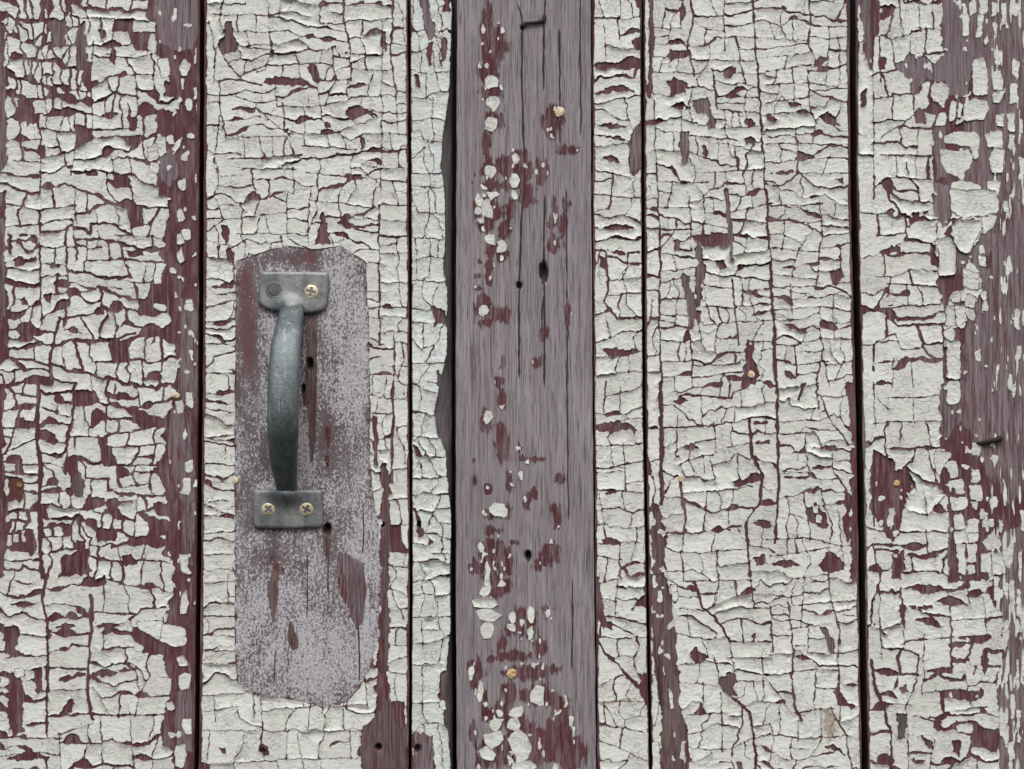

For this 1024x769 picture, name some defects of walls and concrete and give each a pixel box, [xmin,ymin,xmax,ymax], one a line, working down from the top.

crack [357,30,383,187]
crack [869,0,877,215]
crack [0,211,82,734]
peeling [0,0,452,769]
crack [371,215,381,342]
crack [656,196,689,503]
peeling [467,0,1024,769]
crack [710,0,819,576]
crack [872,344,891,572]
crack [571,581,662,711]
crack [695,585,769,643]
crack [871,662,909,769]